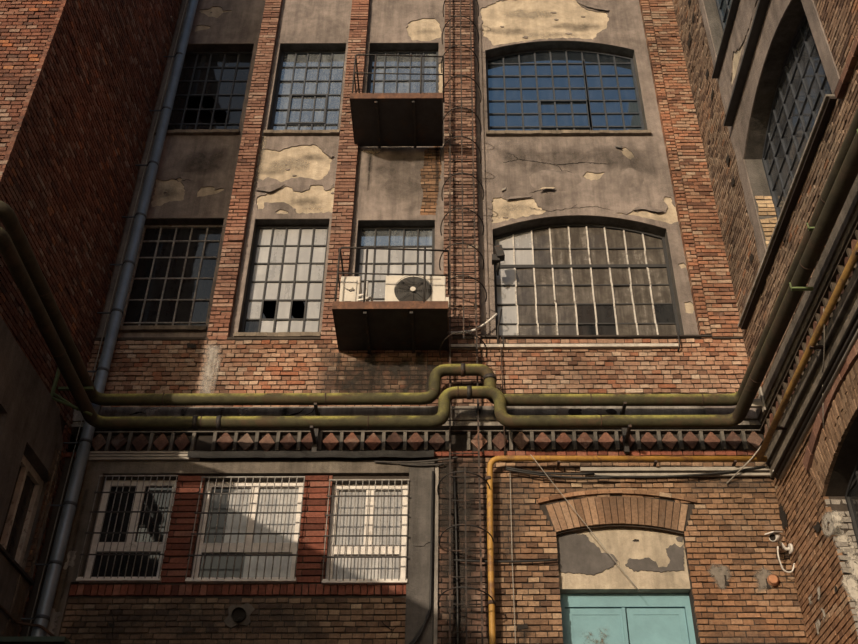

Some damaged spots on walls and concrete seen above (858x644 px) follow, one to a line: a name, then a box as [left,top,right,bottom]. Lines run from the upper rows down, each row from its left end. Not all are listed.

flaking render [406,19,442,41]
flaking render [480,0,609,45]
flaking render [732,41,745,83]
flaking render [256,145,335,214]
flaking render [420,146,441,215]
crack [503,153,605,173]
flaking render [491,187,555,224]
flaking render [556,533,684,575]
spalling [813,511,858,615]